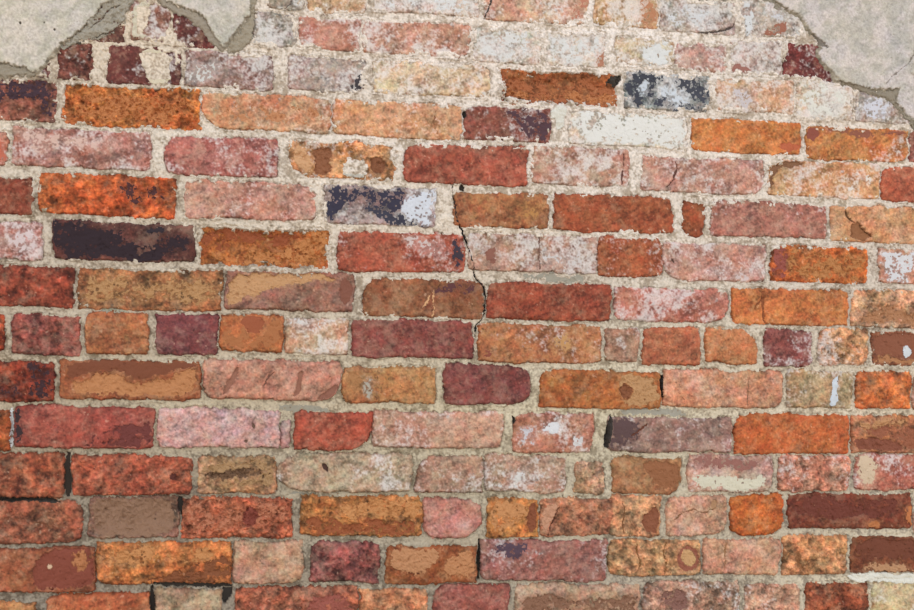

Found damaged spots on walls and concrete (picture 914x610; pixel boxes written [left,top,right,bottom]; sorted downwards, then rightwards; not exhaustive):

spalling [61,0,134,50]
spalling [157,0,256,53]
spalling [505,75,615,106]
spalling [293,146,332,175]
spalling [769,80,914,188]
spalling [85,228,354,306]
crack [452,179,487,337]
spalling [861,304,914,364]
spalling [67,359,198,398]
spalling [306,498,475,579]
spalling [642,507,660,533]
spalling [522,593,639,610]